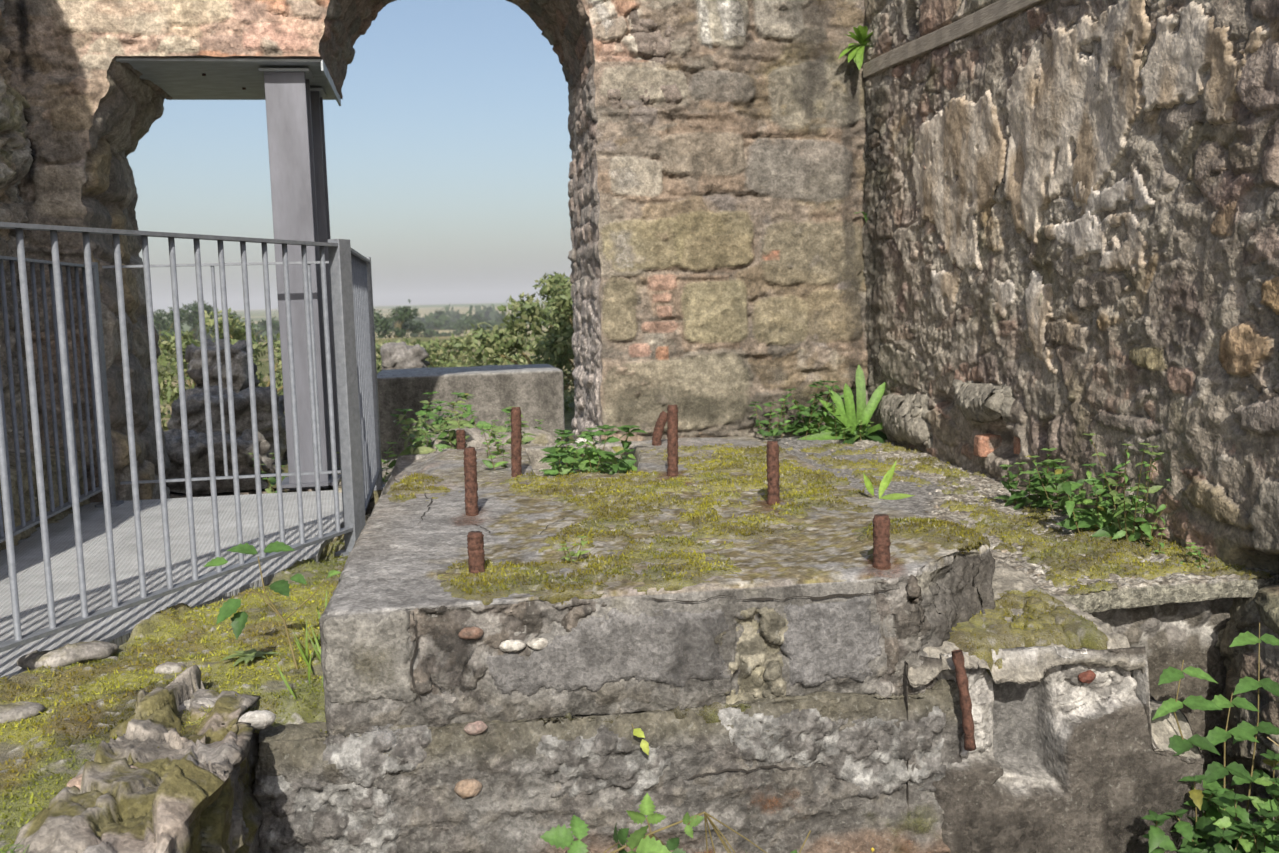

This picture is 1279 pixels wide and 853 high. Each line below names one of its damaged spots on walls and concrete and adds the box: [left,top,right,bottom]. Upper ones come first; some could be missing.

peeling [911,0,1270,319]
peeling [991,270,1058,375]